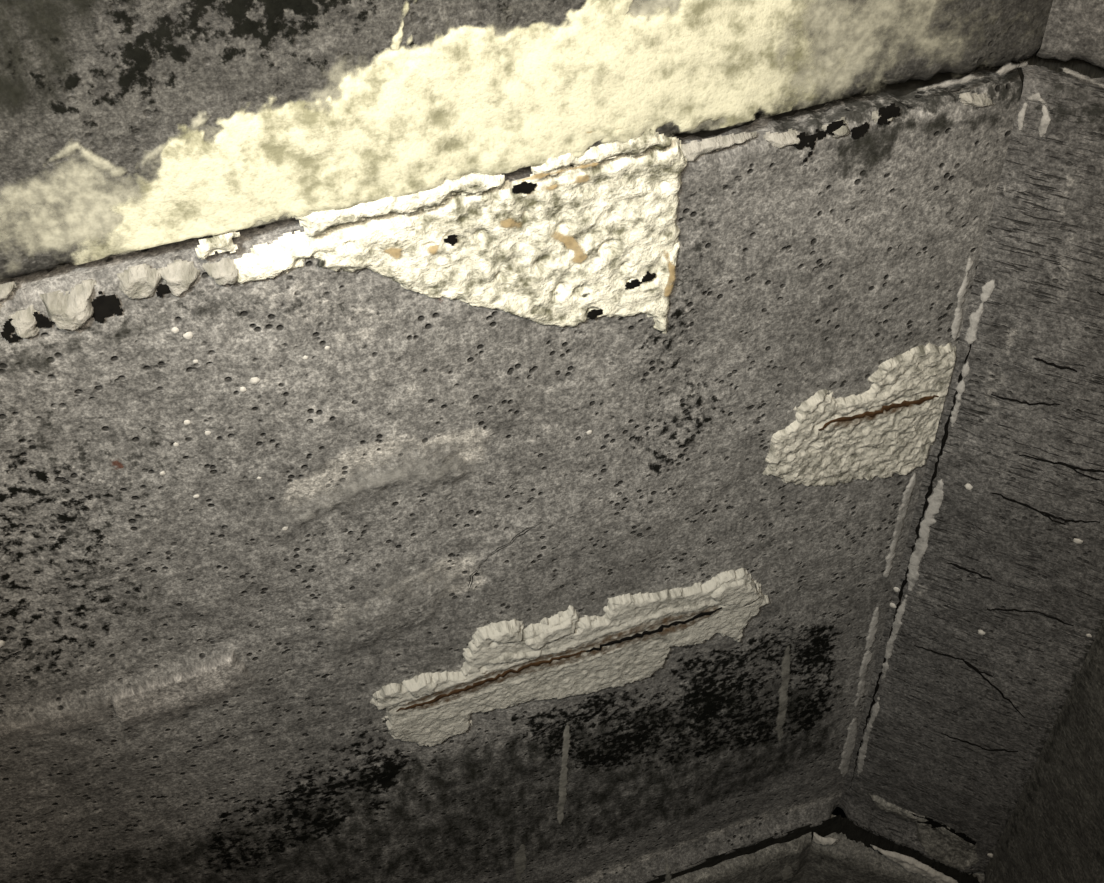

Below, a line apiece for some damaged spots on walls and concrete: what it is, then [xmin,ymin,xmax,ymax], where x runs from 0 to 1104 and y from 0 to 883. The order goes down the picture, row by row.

leakage [0,0,962,487]
peeling [0,281,17,300]
peeling [8,279,97,339]
peeling [117,257,239,300]
crack [1034,357,1077,372]
crack [991,394,1060,406]
crack [1019,454,1104,480]
crack [992,493,1100,525]
leakage [0,438,126,676]
crack [849,343,1025,789]
crack [987,608,1074,626]
leakage [76,568,843,883]